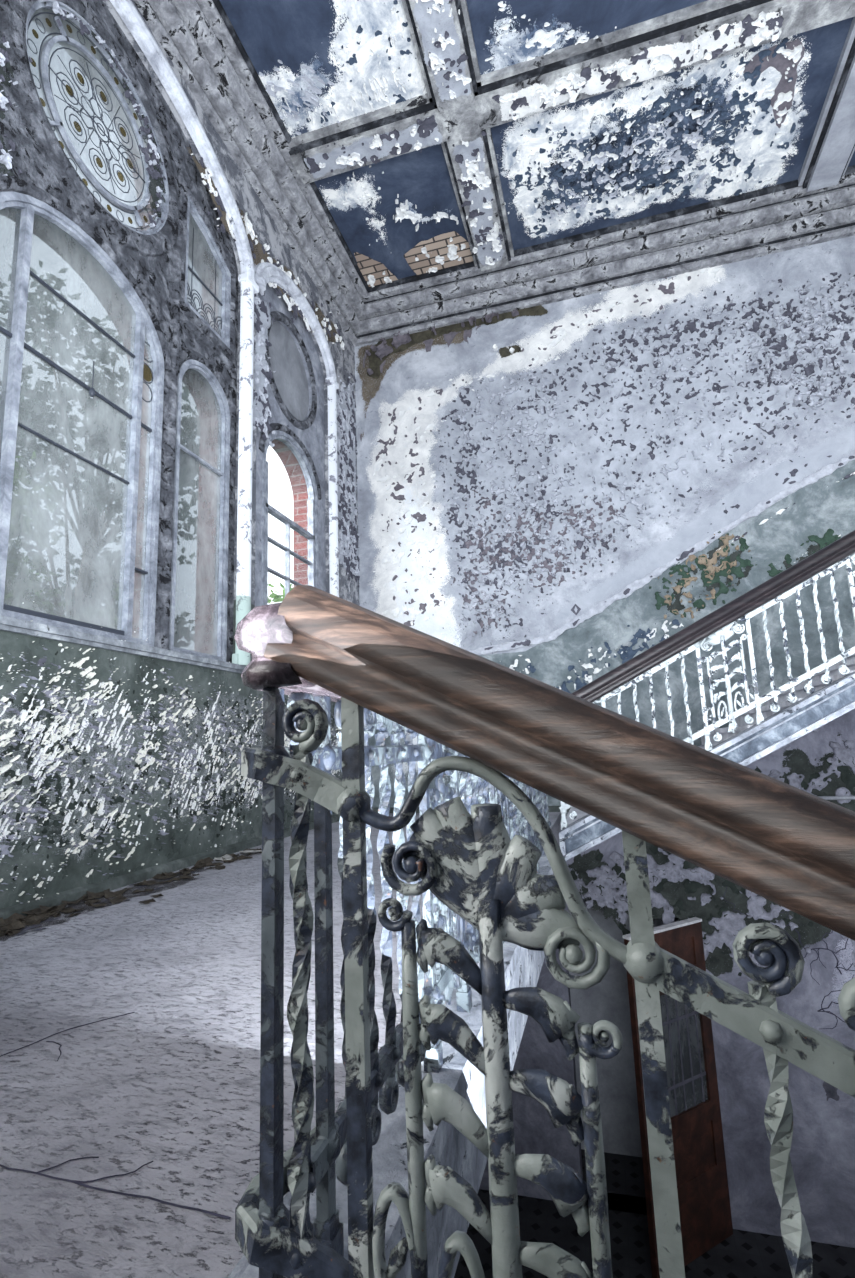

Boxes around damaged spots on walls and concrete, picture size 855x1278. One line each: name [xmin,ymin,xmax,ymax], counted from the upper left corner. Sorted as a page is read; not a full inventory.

peeling [412,0,471,102]
peeling [492,11,805,129]
flaking render [304,115,506,275]
peeling [187,147,348,447]
flaking render [354,252,398,288]
peeling [336,305,548,588]
peeling [434,272,855,694]
peeling [755,728,855,812]
peeling [568,849,630,935]
peeling [645,841,849,979]
crack [0,1012,135,1061]
crack [0,1157,231,1220]